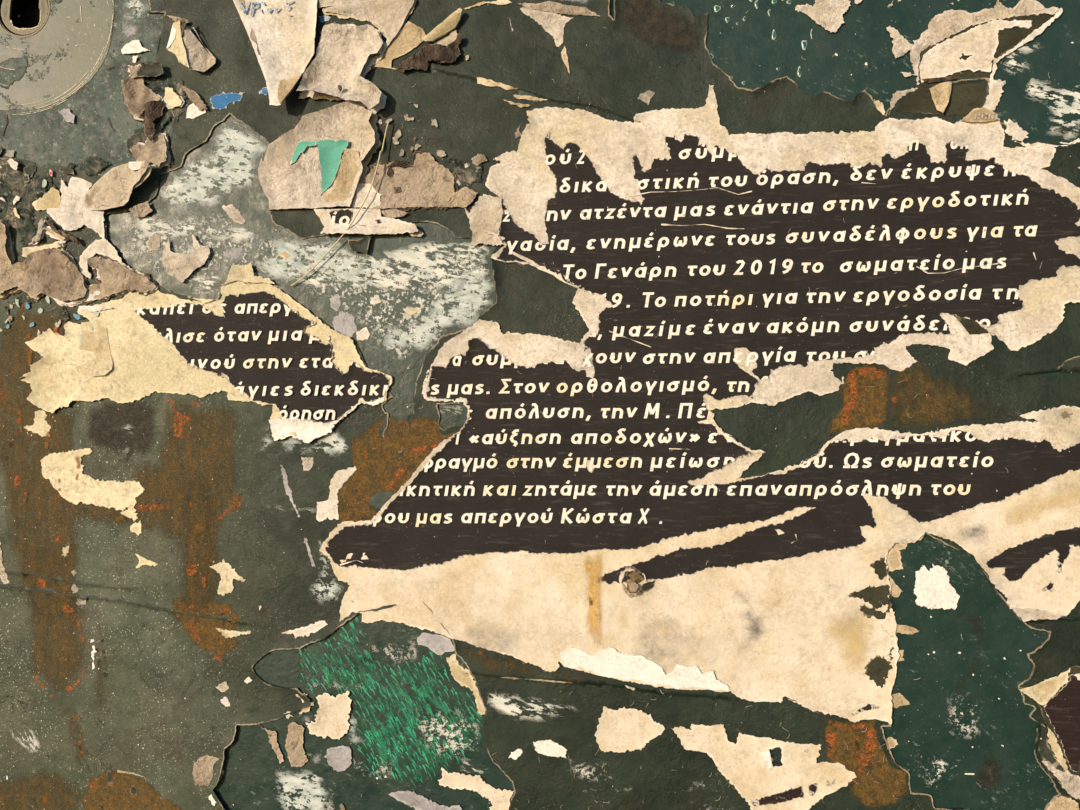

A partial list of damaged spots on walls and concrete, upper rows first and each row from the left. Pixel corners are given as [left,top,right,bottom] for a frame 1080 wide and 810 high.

peeling [127,72,187,148]
peeling [661,0,1020,114]
peeling [990,0,1080,143]
peeling [0,147,110,254]
peeling [107,115,496,445]
rust [830,364,972,433]
rust [0,304,242,698]
rust [339,416,457,523]
crack [0,571,230,622]
peeling [560,647,730,690]
peeling [882,534,1065,810]
rust [825,720,906,808]